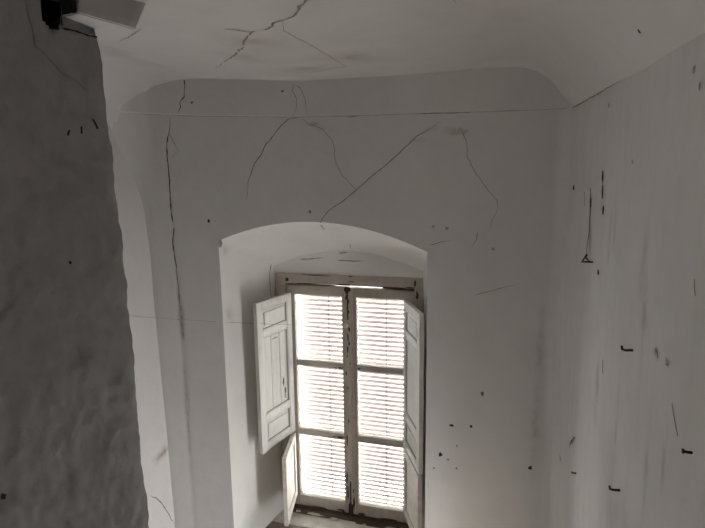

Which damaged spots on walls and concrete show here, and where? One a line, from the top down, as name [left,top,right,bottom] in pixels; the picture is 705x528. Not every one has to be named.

crack [220,0,344,71]
crack [166,80,185,311]
crack [247,84,498,248]